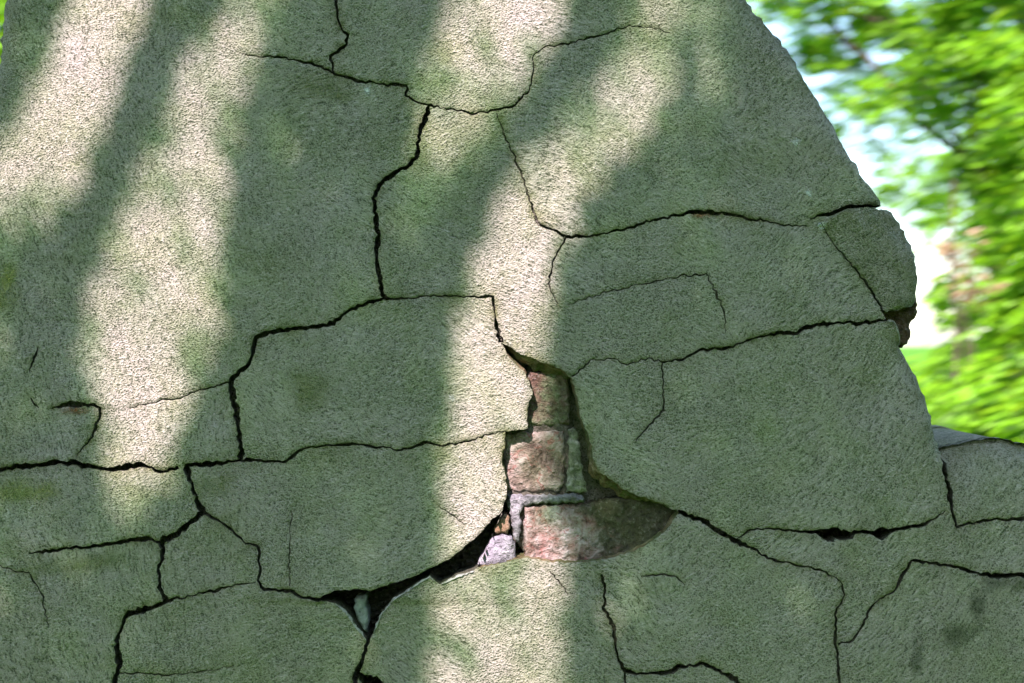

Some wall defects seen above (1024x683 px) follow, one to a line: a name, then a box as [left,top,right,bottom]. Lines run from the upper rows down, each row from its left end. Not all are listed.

crack [0,0,807,683]
spalling [477,343,678,567]
crack [572,204,888,441]
crack [678,448,1024,683]